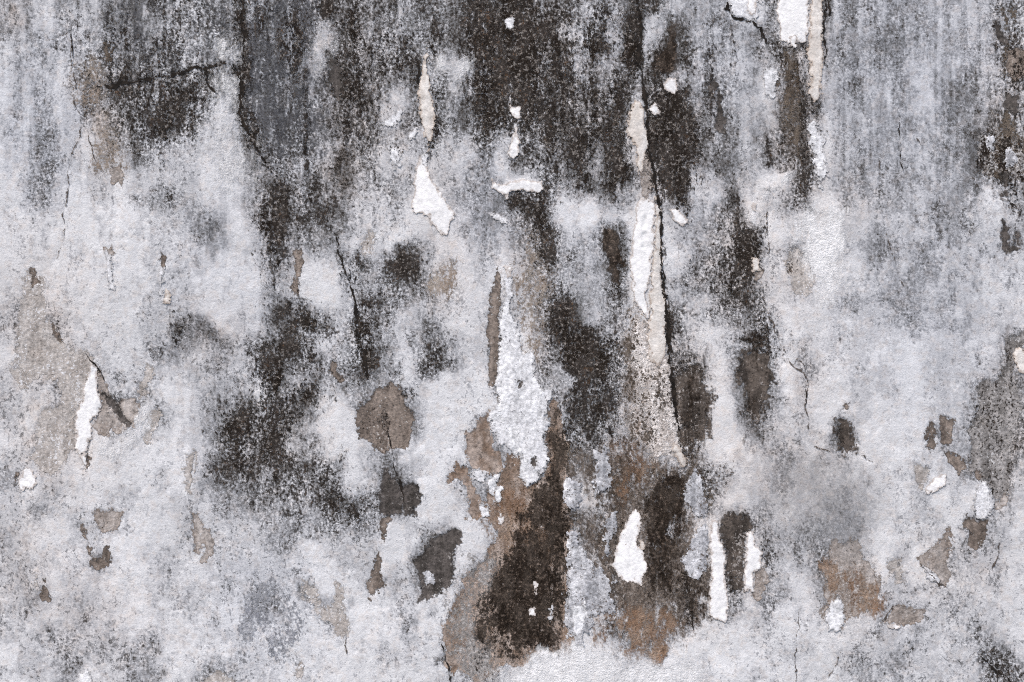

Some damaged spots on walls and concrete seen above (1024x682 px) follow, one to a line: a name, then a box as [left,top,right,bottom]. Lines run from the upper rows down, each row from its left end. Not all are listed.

spalling [9,267,163,491]
crack [49,0,272,268]
crack [334,233,368,379]
spalling [354,381,424,604]
crack [385,419,404,502]
peeling [387,127,455,236]
water stain [63,0,788,671]
peeling [491,178,544,199]
spalling [407,265,707,682]
peeling [630,151,656,318]
crack [633,0,687,464]
spalling [914,330,1024,588]